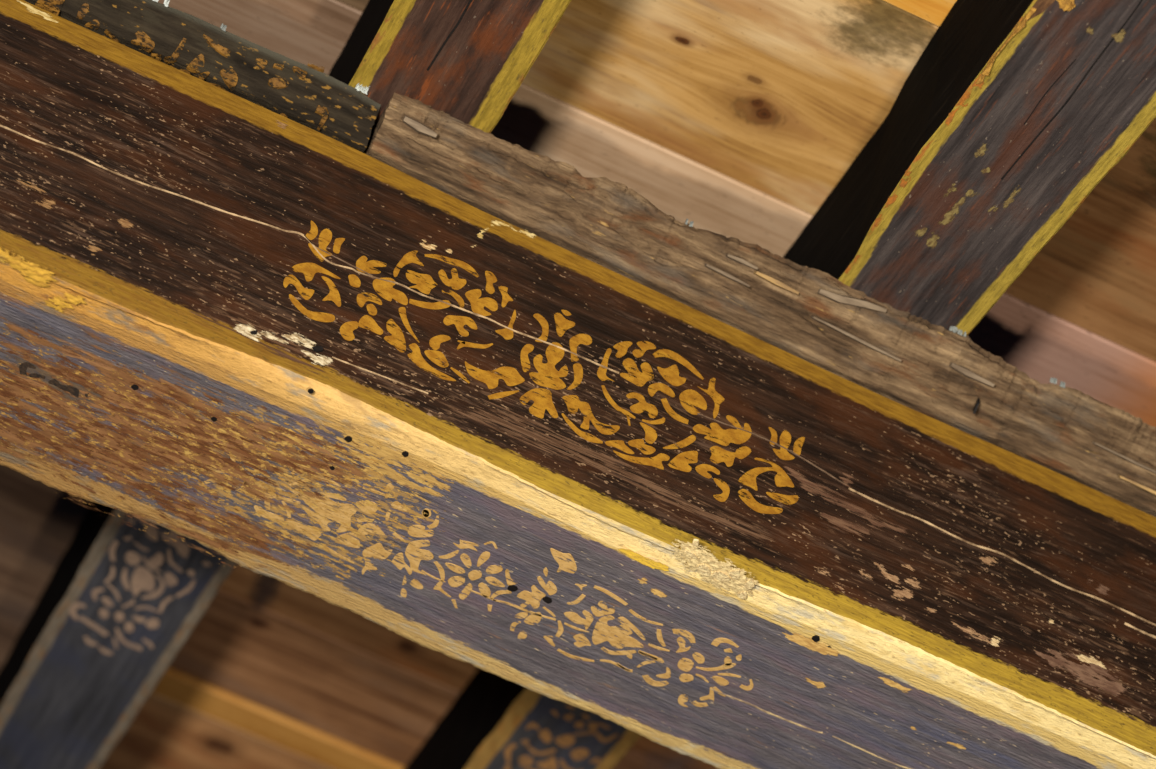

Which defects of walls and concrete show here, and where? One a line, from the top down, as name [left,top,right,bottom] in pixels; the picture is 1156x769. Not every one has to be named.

crack [427,0,472,71]
damp [840,0,930,55]
peeling [16,180,56,209]
peeling [0,248,86,313]
crack [0,125,619,374]
crack [332,356,428,394]
peeling [0,318,454,587]
crack [698,413,1156,639]
spalling [618,539,758,599]
crack [710,688,911,769]